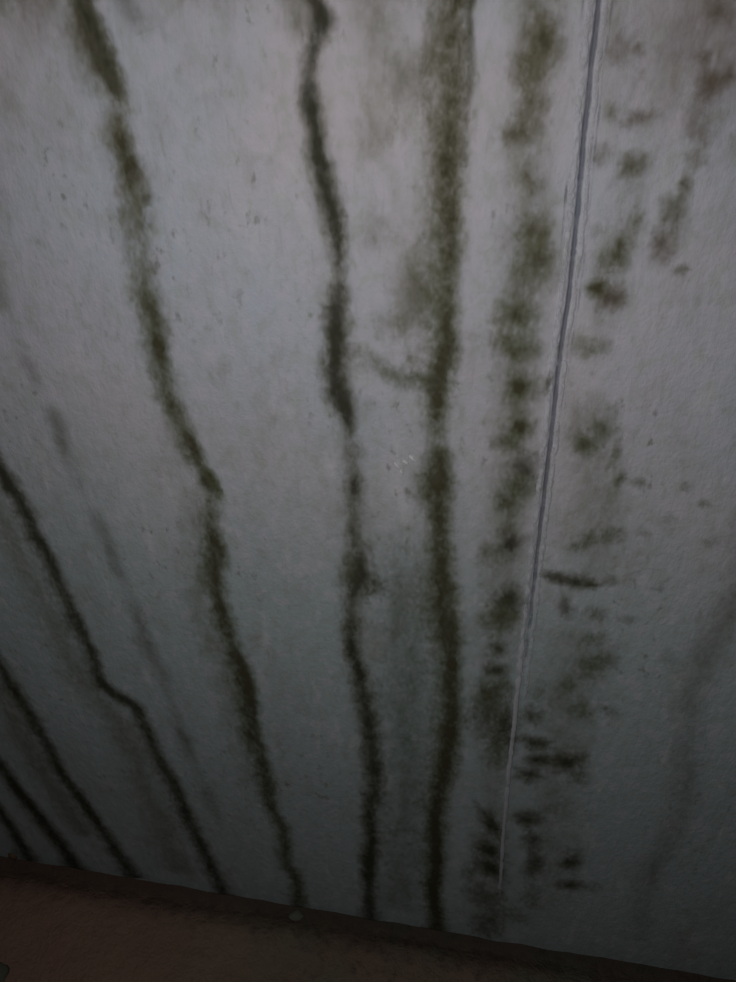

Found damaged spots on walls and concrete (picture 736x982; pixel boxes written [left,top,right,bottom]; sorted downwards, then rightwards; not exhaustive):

damp [73,0,125,102]
damp [0,459,229,895]
damp [113,115,142,213]
damp [140,282,304,908]
damp [301,0,344,269]
damp [325,282,353,431]
damp [344,527,382,921]
damp [386,0,474,433]
damp [422,446,461,932]
damp [509,377,531,397]
crack [498,0,607,890]
damp [544,573,597,587]